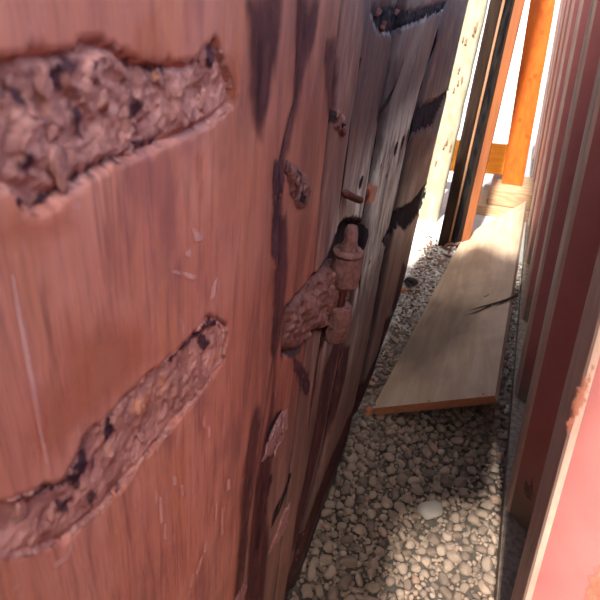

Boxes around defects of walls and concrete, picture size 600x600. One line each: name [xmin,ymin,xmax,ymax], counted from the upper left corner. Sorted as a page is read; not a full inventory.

spalling [370,1,446,34]
spalling [0,38,233,217]
spalling [0,313,228,560]
peeling [567,378,590,430]